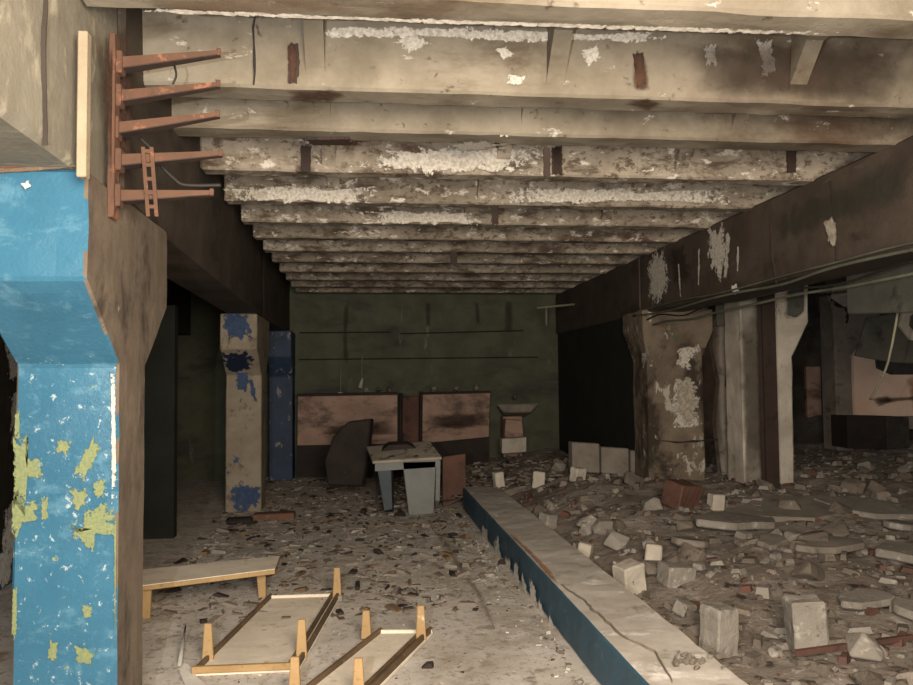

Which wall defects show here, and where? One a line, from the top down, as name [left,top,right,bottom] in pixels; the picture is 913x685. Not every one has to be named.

peeling [143,9,823,68]
rust [104,51,133,156]
rust [287,42,342,102]
rust [628,52,659,110]
spalling [300,136,353,172]
peeling [364,135,540,176]
peeling [225,184,730,226]
peeling [645,246,686,305]
peeling [707,222,729,282]
peeling [668,347,702,428]
peeling [0,345,49,640]
peeling [68,370,116,621]